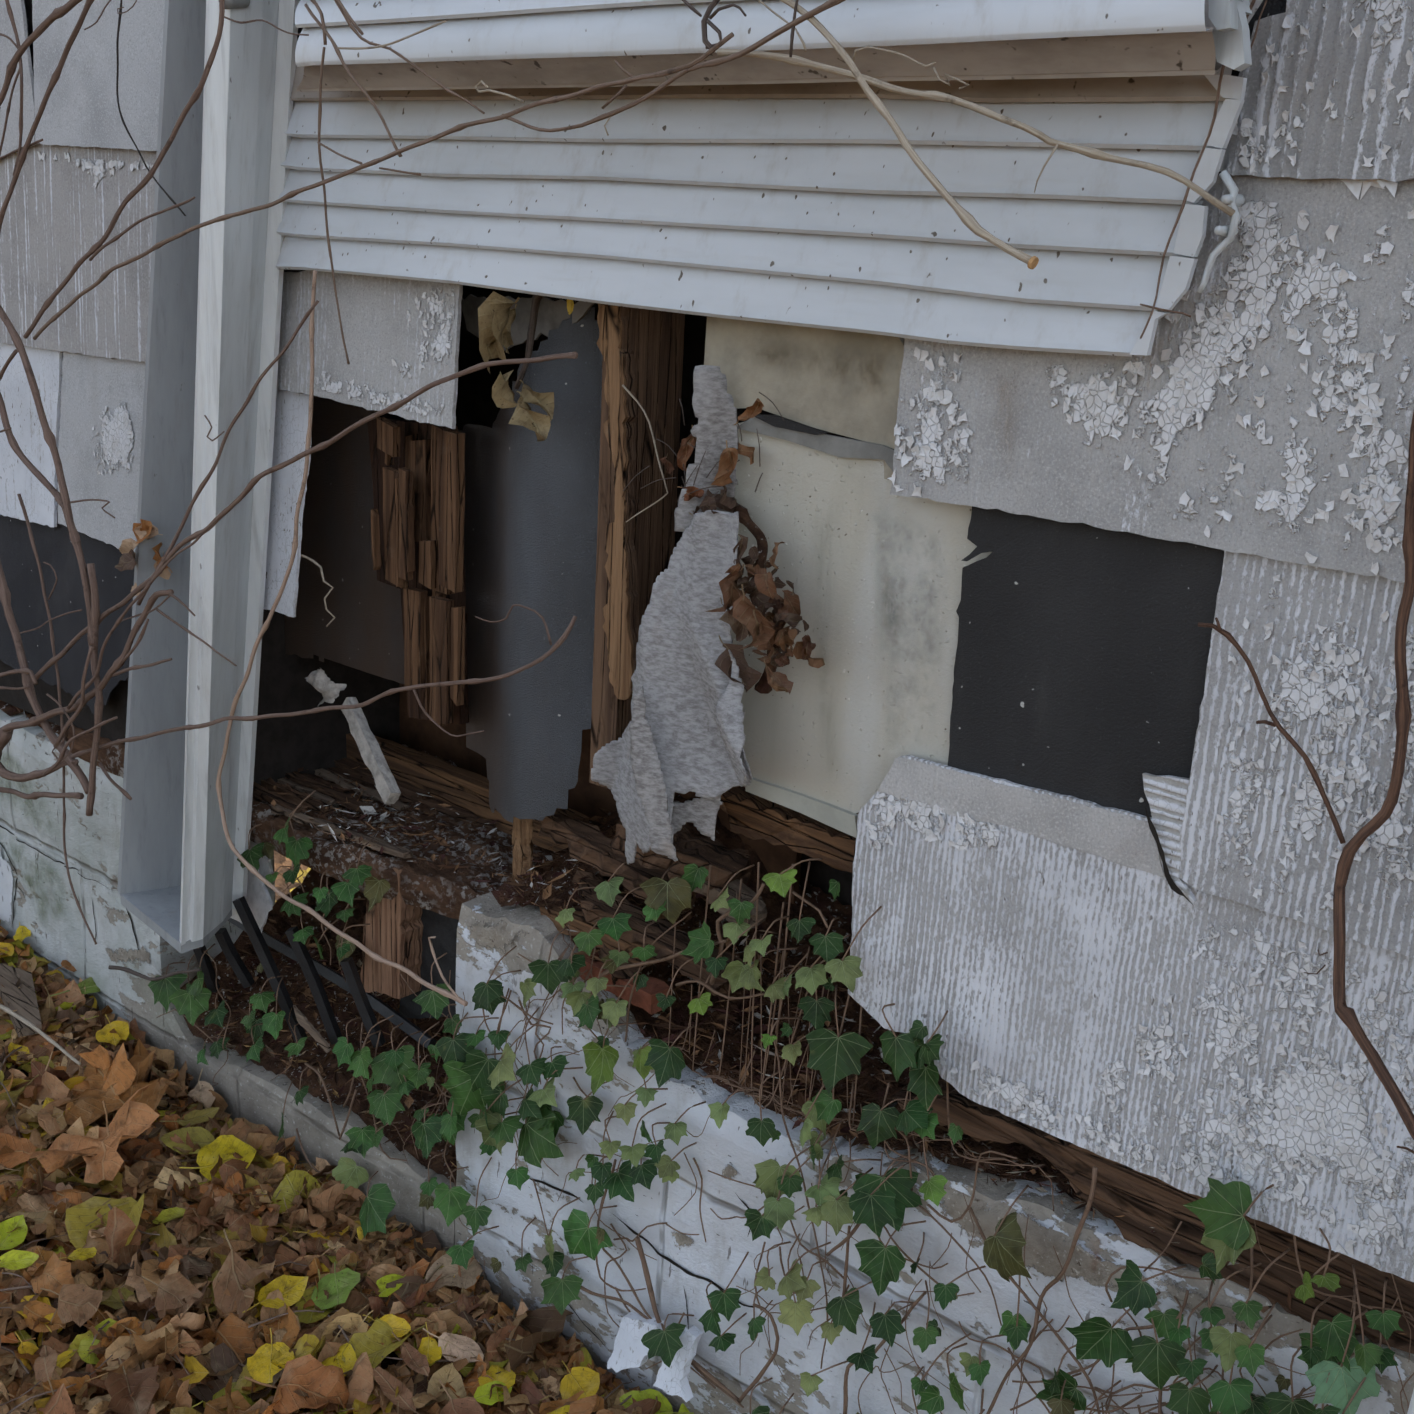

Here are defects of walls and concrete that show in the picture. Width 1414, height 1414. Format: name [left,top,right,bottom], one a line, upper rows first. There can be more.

peeling [1229,0,1414,200]
peeling [90,402,135,476]
peeling [314,287,455,416]
peeling [887,347,973,497]
peeling [1045,199,1414,575]
peeling [864,792,1001,851]
peeling [1216,574,1414,919]
peeling [939,921,1414,1287]
crack [529,1178,582,1202]
crack [613,1214,753,1329]